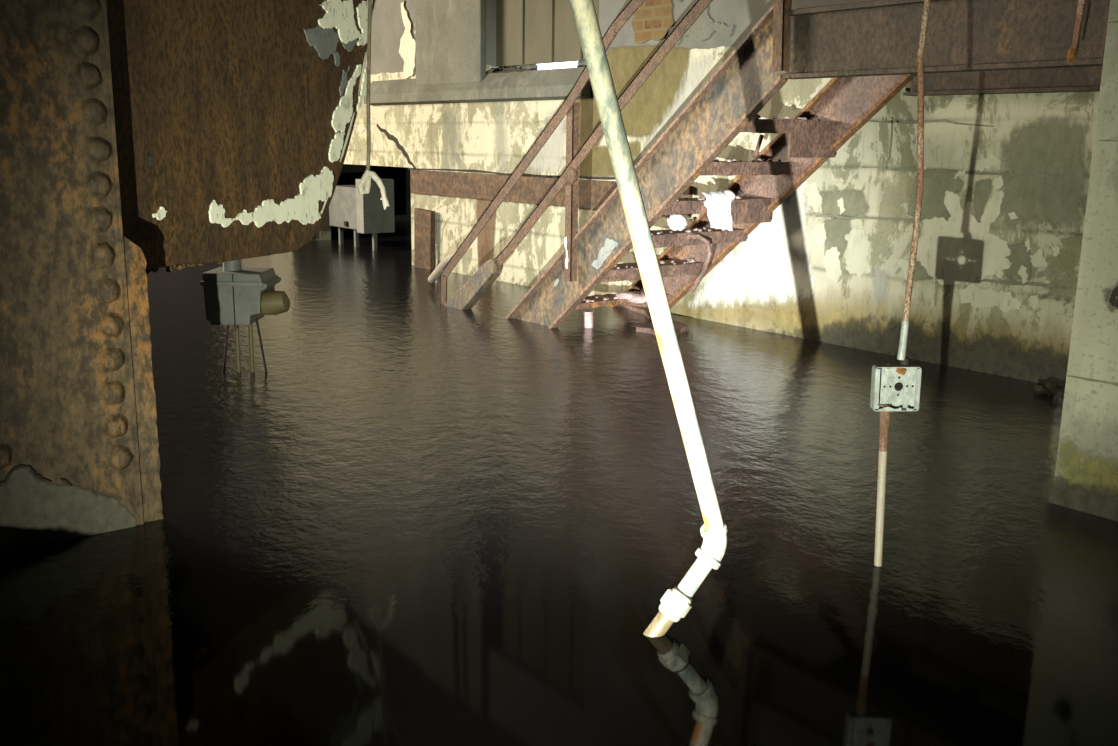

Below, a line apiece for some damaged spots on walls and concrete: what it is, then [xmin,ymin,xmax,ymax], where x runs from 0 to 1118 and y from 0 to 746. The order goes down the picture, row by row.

peeling [209,0,376,227]
peeling [152,207,167,220]
corrosion [477,199,496,269]
peeling [803,182,871,283]
leakage [671,181,1069,386]
peeling [893,147,1061,312]
corrosion [0,468,136,545]
leakage [1047,477,1118,521]